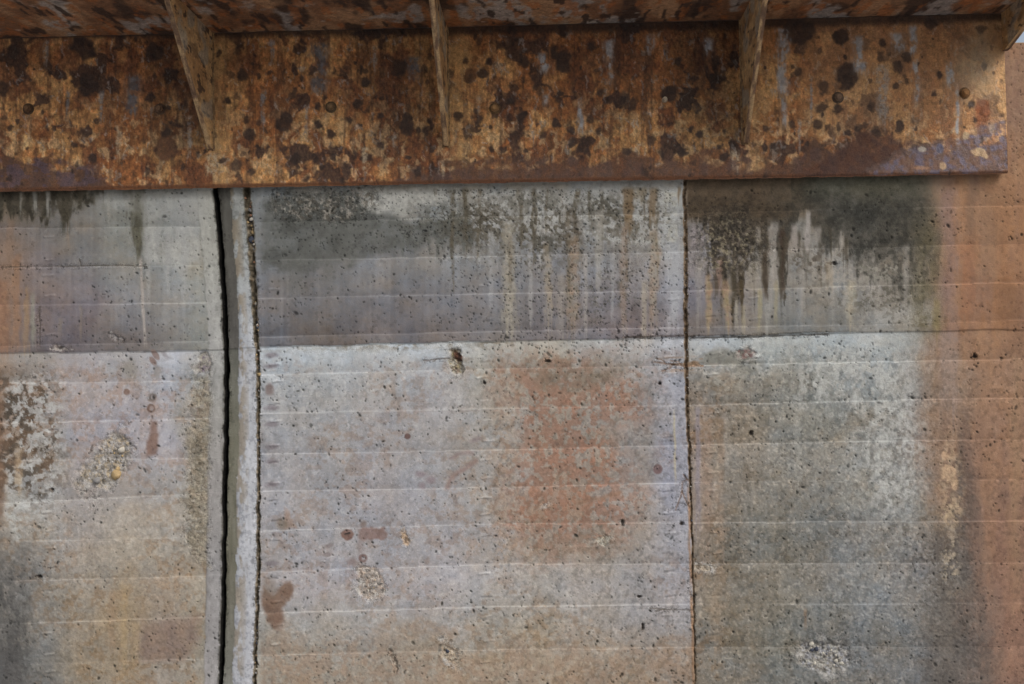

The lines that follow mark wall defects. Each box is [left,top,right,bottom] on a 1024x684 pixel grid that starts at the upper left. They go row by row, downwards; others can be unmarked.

corrosion [63,37,102,101]
corrosion [781,19,862,94]
corrosion [791,126,908,177]
leakage [255,180,635,309]
leakage [3,188,210,460]
spalling [442,337,467,381]
peeling [0,342,139,535]
crack [621,180,832,684]
leakage [650,208,1014,684]
spalling [350,563,388,608]
corrosion [257,402,731,684]
spalling [786,632,861,684]